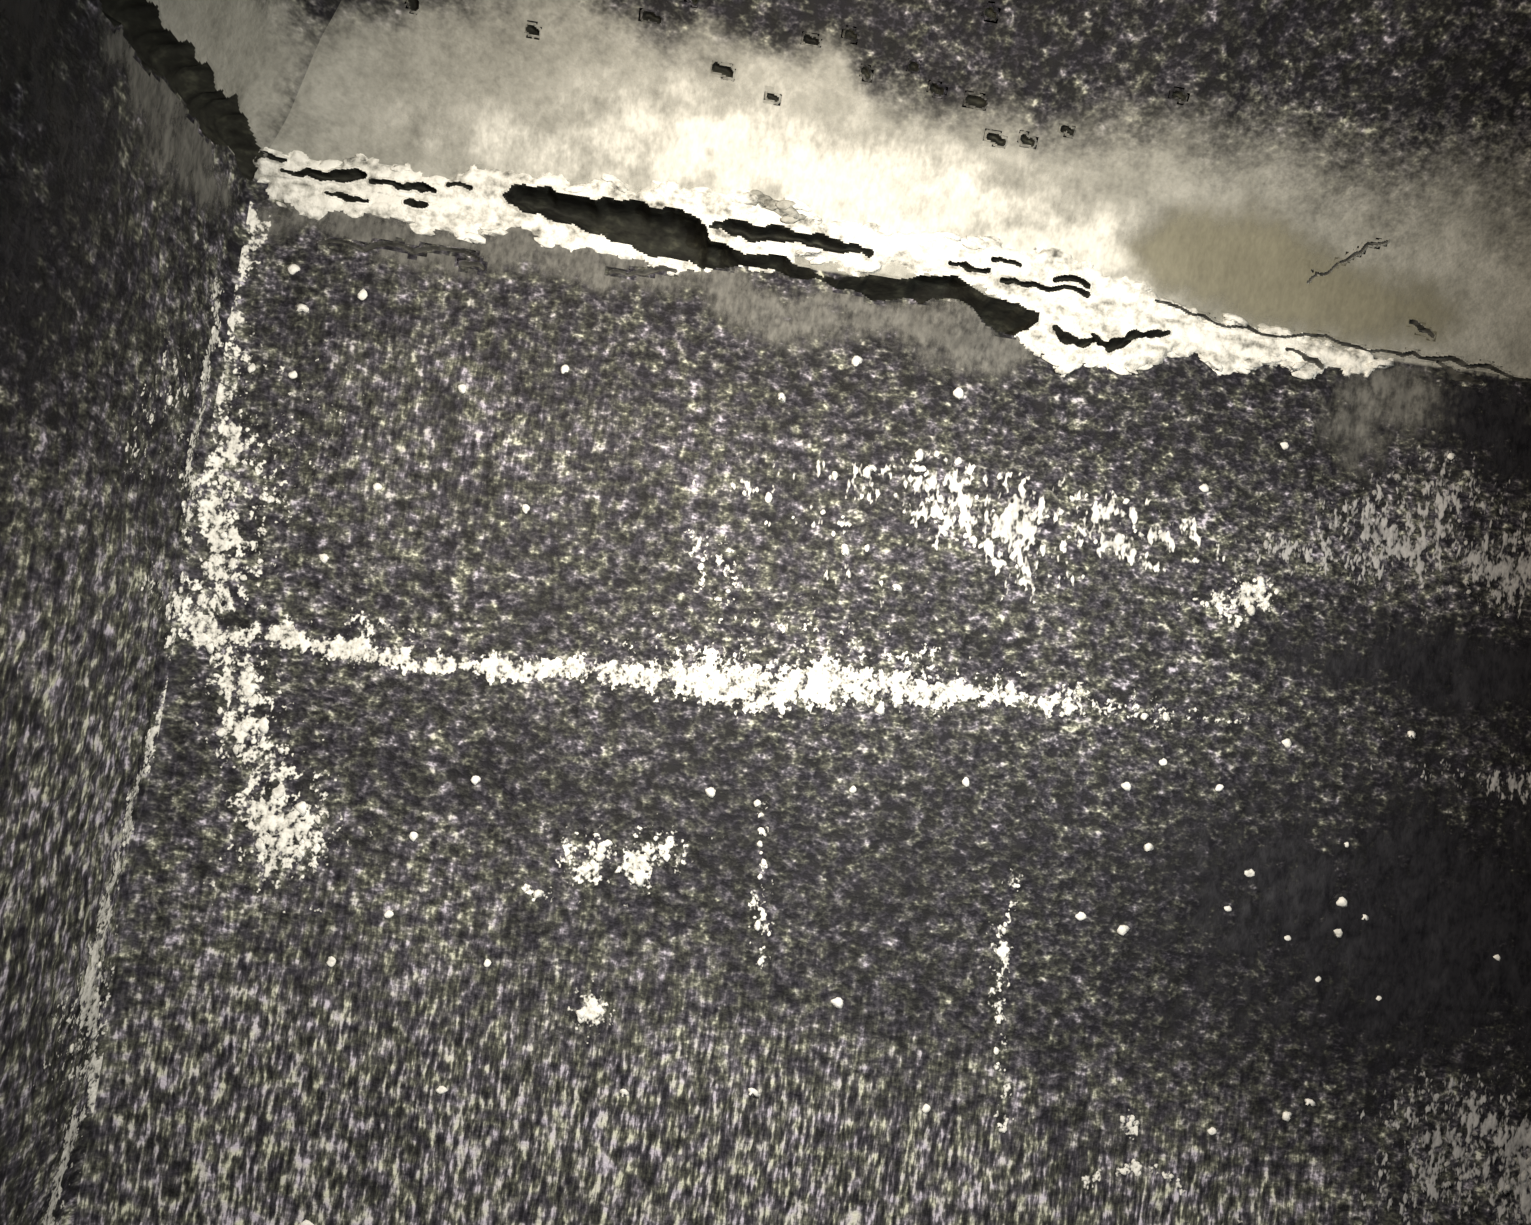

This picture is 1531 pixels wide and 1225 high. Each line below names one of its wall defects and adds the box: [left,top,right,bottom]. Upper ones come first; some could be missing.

spalling [105,27,231,210]
spalling [526,24,540,36]
spalling [712,62,734,78]
crack [95,0,1531,388]
spalling [986,132,1035,147]
spalling [259,203,1030,376]
damp [120,74,1448,913]
damp [1416,371,1531,496]
damp [1258,612,1531,741]
damp [748,799,774,967]
damp [1138,755,1531,1109]
damp [568,992,615,1044]